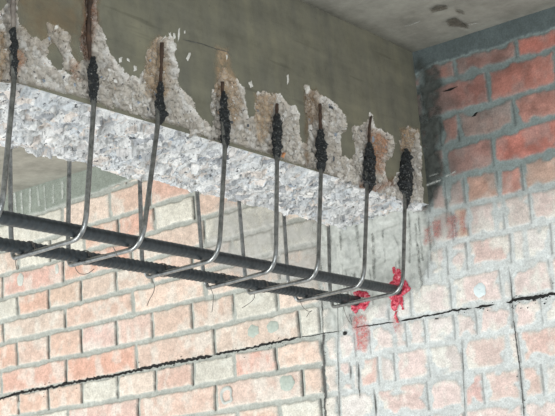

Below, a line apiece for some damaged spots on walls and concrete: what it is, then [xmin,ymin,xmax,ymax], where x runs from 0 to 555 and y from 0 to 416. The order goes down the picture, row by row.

spalling [0,0,429,325]
corrosion [214,51,239,121]
damp [416,61,448,209]
crack [0,300,360,416]
crack [337,277,555,416]